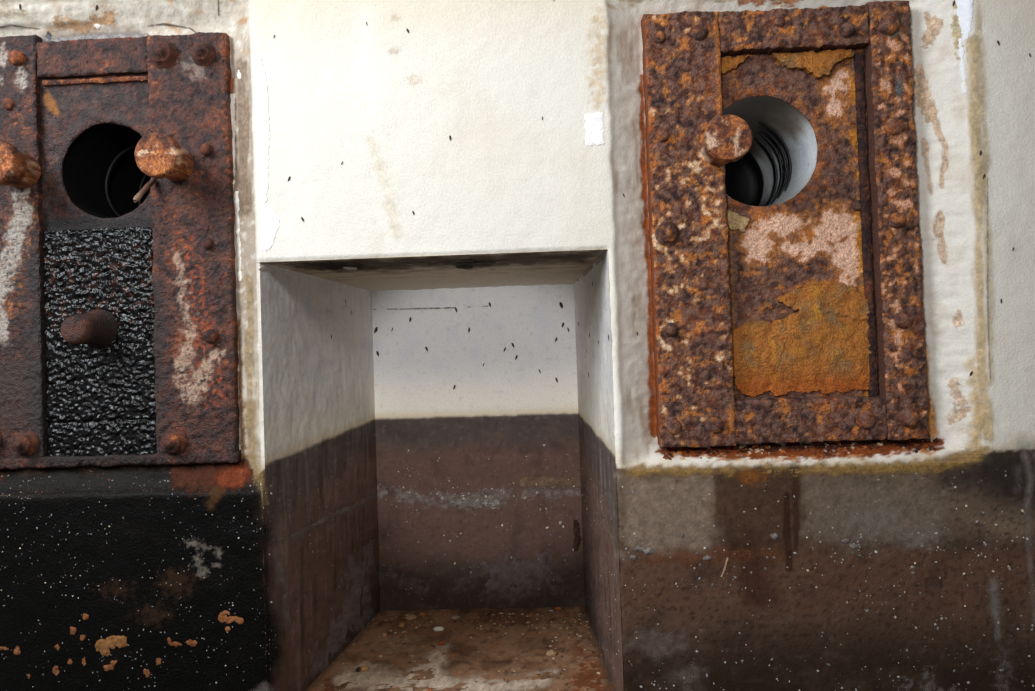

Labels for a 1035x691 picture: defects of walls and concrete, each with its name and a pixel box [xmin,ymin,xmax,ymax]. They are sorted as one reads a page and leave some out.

corrosion [720,54,749,75]
corrosion [771,48,854,79]
corrosion [170,320,252,509]
damp [0,400,616,691]
corrosion [638,75,944,601]
damp [617,17,1035,555]